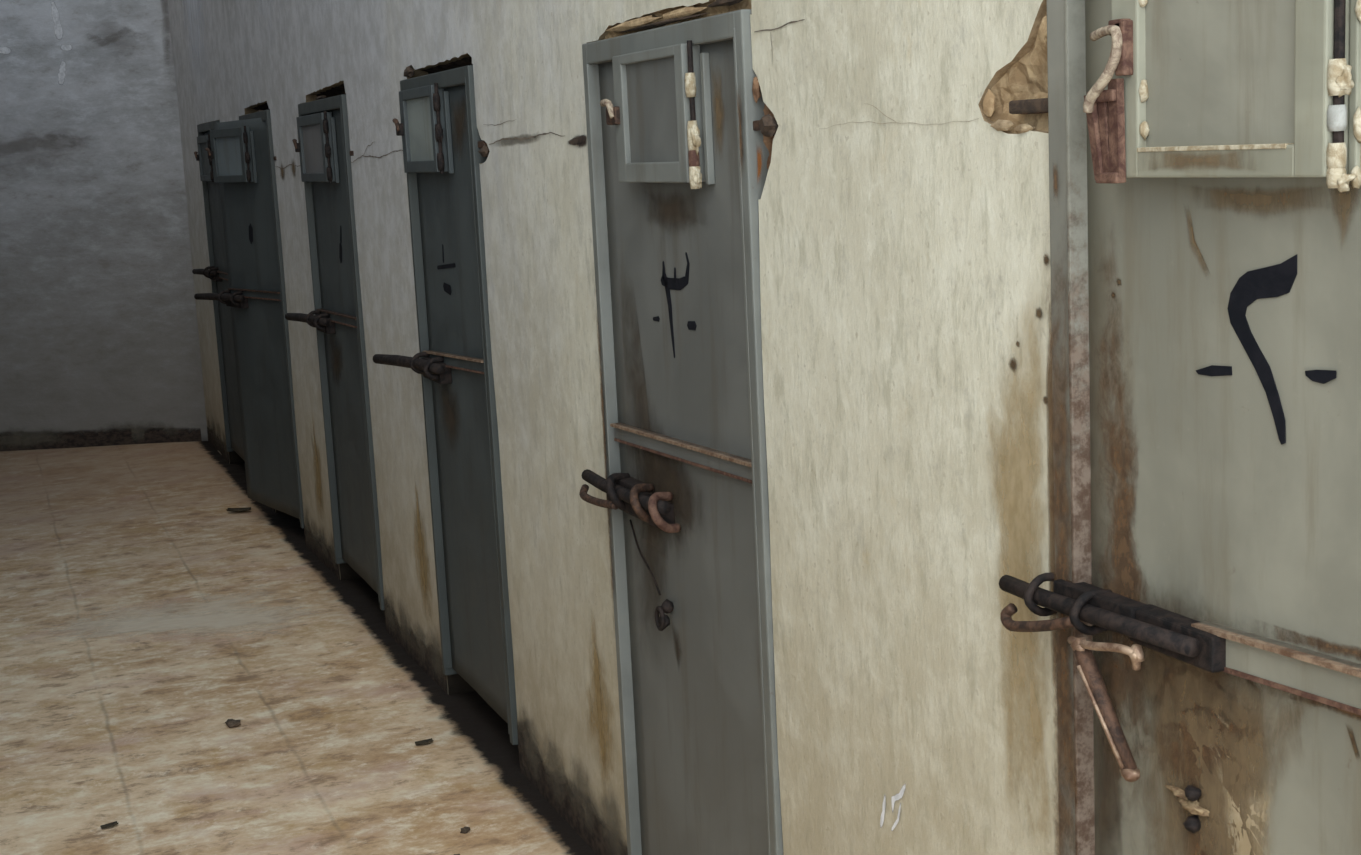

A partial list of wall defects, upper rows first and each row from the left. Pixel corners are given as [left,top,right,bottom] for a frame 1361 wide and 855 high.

flaking render [605,0,752,39]
crack [755,19,805,46]
flaking render [983,9,1048,134]
crack [483,121,560,145]
flaking render [752,77,778,180]
damp [0,421,229,463]
rust [1049,323,1071,582]
rust [1053,612,1076,855]